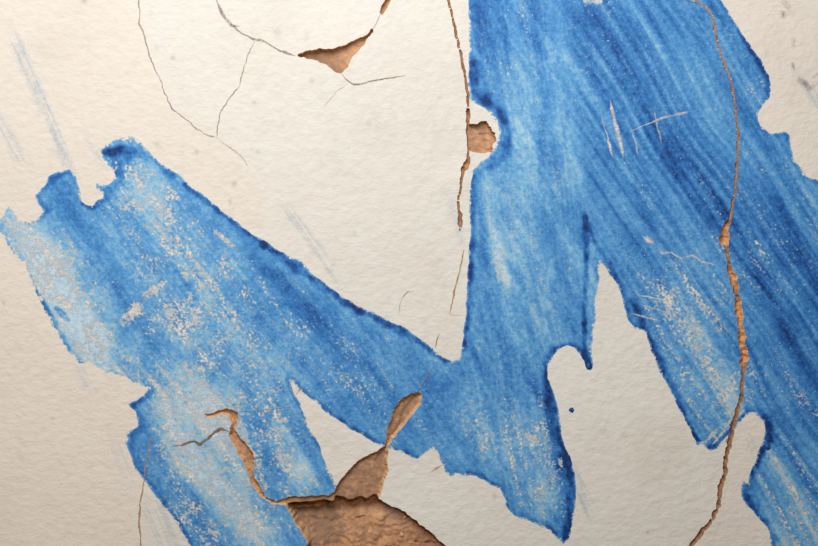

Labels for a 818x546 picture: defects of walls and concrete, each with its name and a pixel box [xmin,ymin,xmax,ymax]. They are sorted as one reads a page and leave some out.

crack [138,0,293,159]
flaking render [298,29,374,74]
crack [447,0,470,107]
flaking render [465,108,497,154]
crack [457,149,471,231]
crack [450,251,464,311]
crack [687,0,749,546]
crack [138,438,152,546]
crack [176,428,228,446]
flaking render [204,392,446,546]